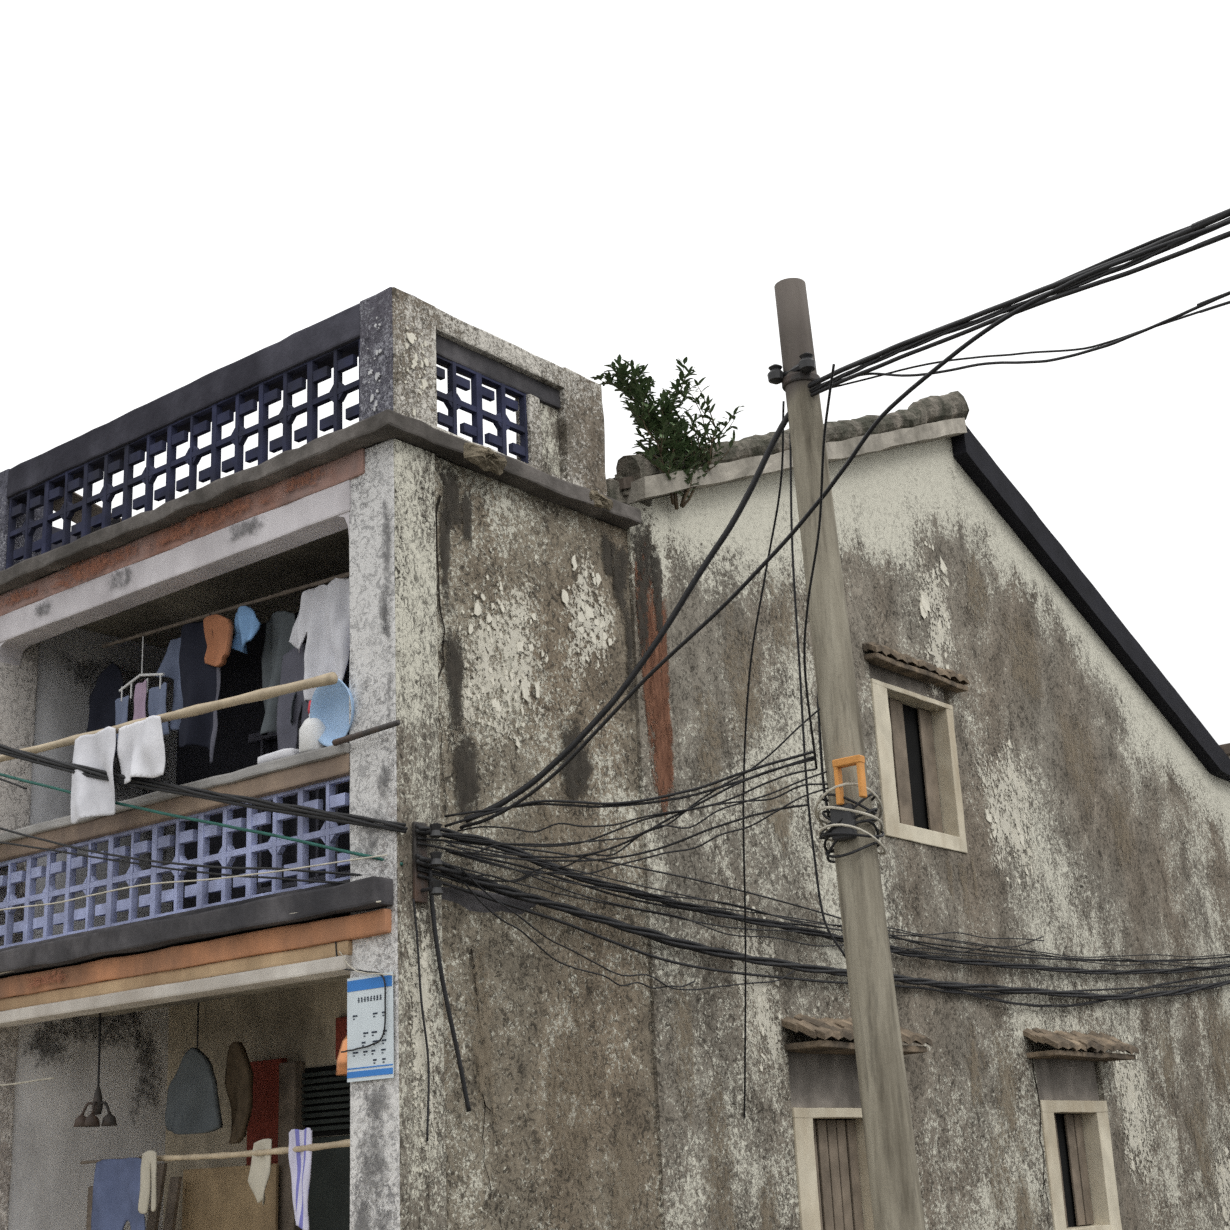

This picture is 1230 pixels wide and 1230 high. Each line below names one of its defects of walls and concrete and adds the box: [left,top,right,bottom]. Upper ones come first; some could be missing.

water stain [439,465,472,610]
water stain [443,626,481,824]
peeling [461,575,548,748]
water stain [526,719,594,859]
peeling [561,555,612,668]
water stain [601,519,663,720]
corrosion [634,549,674,816]
water stain [694,608,763,801]
water stain [763,778,793,855]
water stain [24,1012,163,1118]
water stain [468,944,497,1120]
water stain [965,1022,1039,1230]